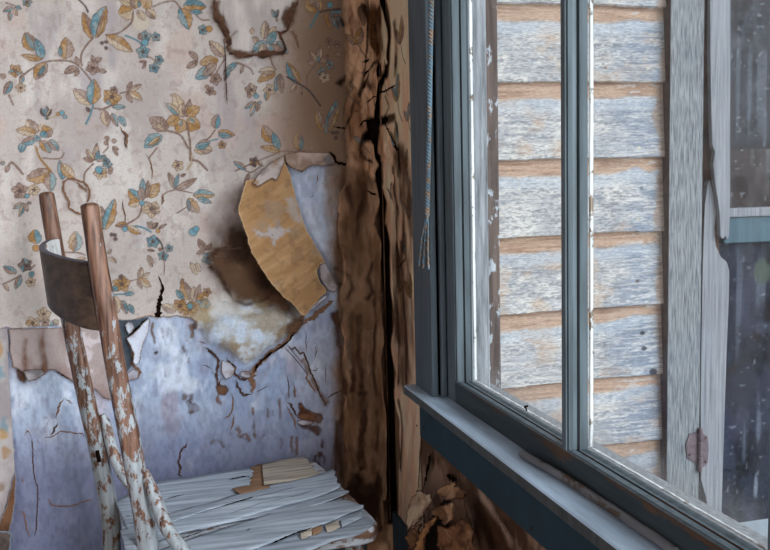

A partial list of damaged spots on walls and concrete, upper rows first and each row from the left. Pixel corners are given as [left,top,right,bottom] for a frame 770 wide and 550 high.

peeling [211,0,299,59]
crack [366,0,385,18]
crack [154,251,165,317]
damp [208,220,293,315]
crack [330,35,406,523]
peeling [8,327,73,383]
peeling [81,328,111,400]
peeling [118,317,150,380]
spalling [216,384,228,404]
spalling [287,402,323,436]
crack [19,398,93,536]
crack [177,444,187,477]